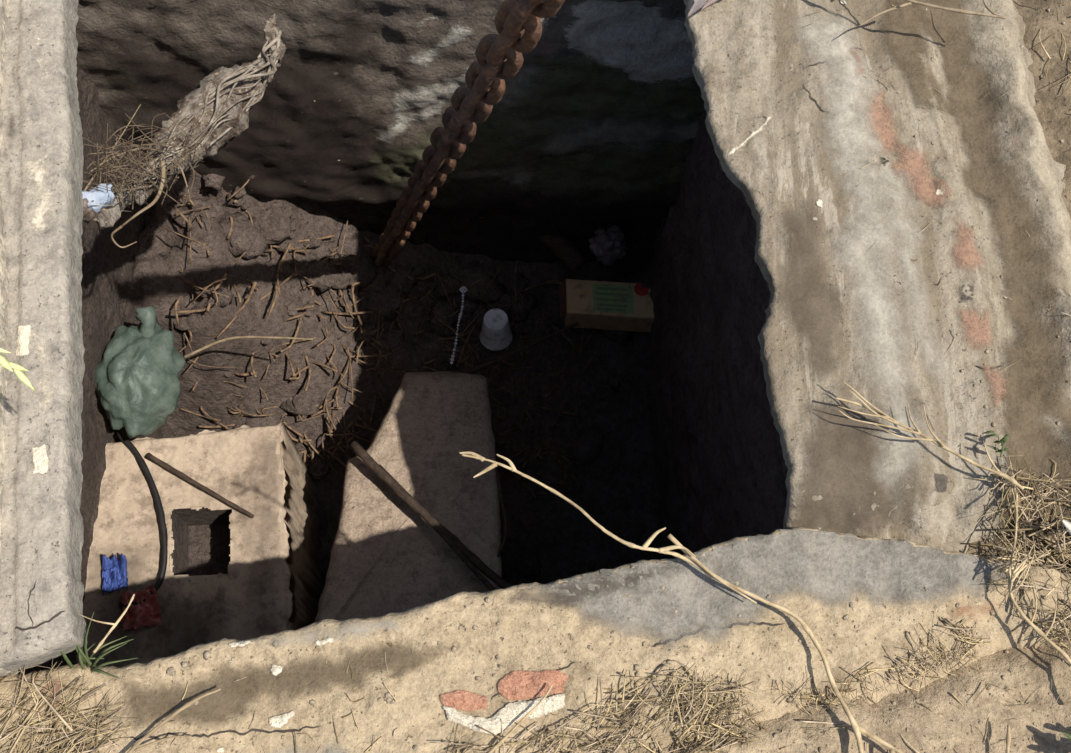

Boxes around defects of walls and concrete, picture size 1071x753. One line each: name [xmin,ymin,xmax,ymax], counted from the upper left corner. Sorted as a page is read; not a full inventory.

damp [99,43,254,152]
damp [192,56,431,234]
damp [407,54,706,276]
crack [652,621,785,647]
crack [126,726,320,741]
spalling [440,670,568,735]